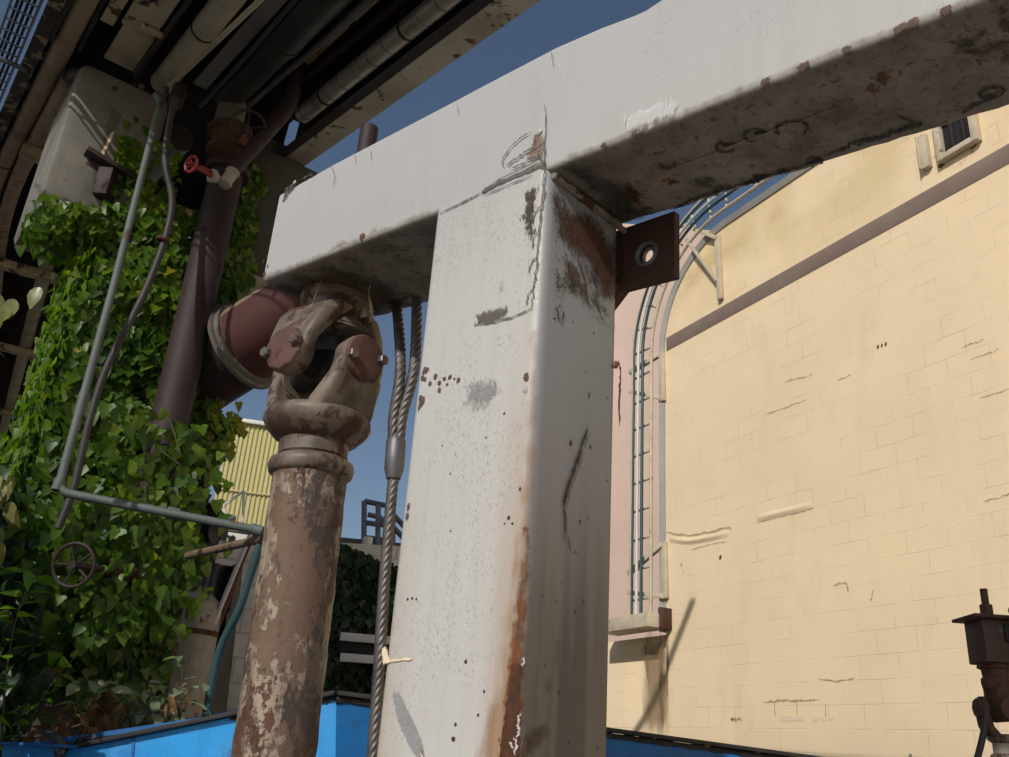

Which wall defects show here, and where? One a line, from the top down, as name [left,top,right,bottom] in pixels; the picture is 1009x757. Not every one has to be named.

crack [441,106,546,308]
crack [671,115,923,210]
crack [767,374,811,414]
crack [667,527,731,550]
corrosion [477,561,527,757]
water stain [645,633,669,724]
crack [763,678,854,723]